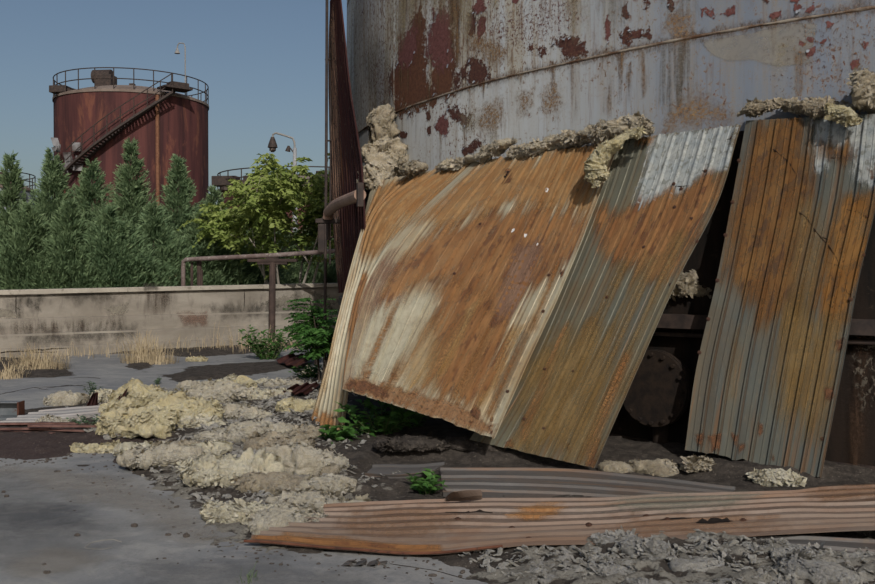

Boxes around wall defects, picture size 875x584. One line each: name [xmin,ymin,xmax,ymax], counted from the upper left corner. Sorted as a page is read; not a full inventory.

peeling [604,2,652,46]
peeling [701,4,736,19]
peeling [790,0,817,14]
peeling [782,17,875,69]
peeling [387,0,589,157]
corrosion [328,9,343,275]
corrosion [722,117,874,429]
corrosion [342,143,722,460]
corrosion [254,535,442,552]